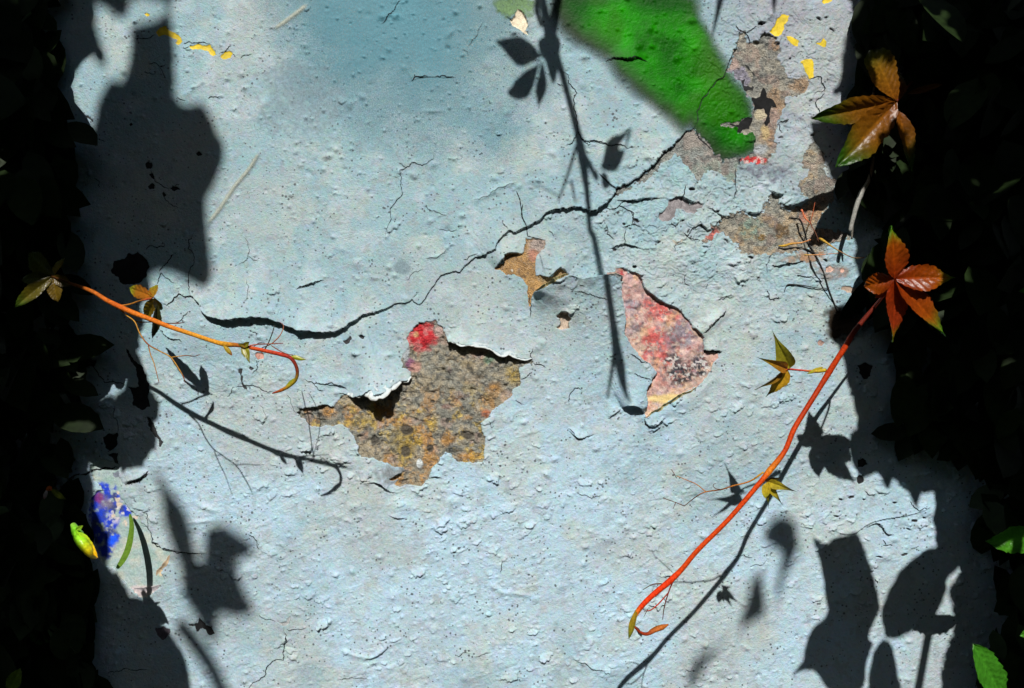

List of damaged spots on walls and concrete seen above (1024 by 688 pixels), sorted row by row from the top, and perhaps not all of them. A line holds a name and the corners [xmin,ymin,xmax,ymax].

spalling [298,320,533,487]
crack [146,22,765,342]
peeling [495,238,569,306]
peeling [607,266,718,418]
crack [684,277,734,354]
spalling [615,22,812,245]
spalling [701,134,850,273]